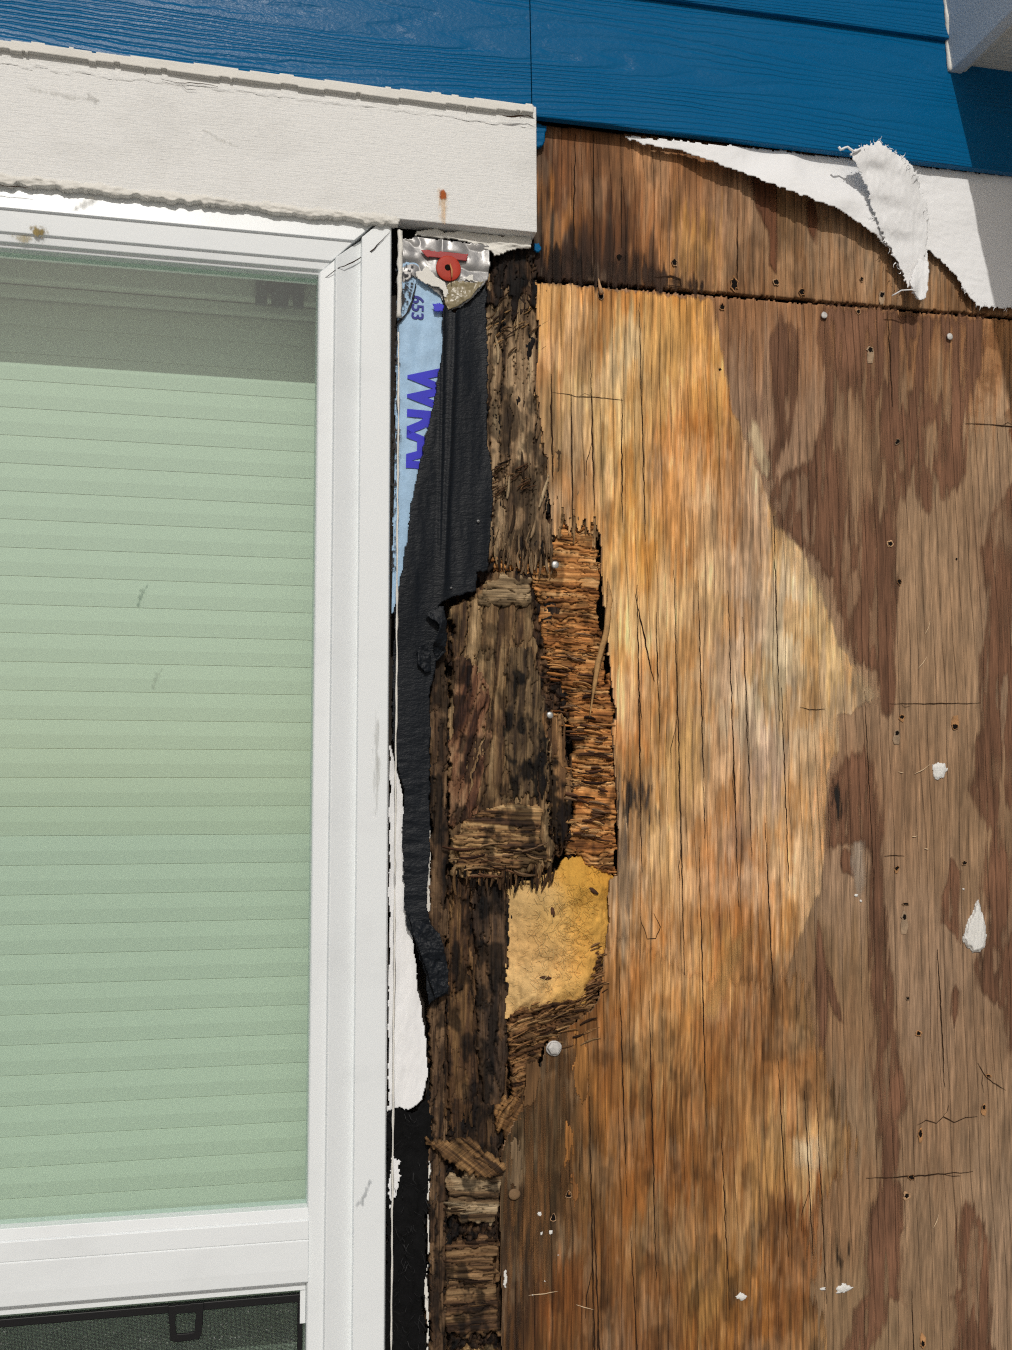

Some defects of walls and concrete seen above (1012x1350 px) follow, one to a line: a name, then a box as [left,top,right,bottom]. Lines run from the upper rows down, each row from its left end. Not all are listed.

peeling [478,573,533,608]
peeling [442,655,555,895]
damp [500,242,982,1350]
damp [970,484,1012,1052]
peeling [494,1086,526,1140]
damp [954,1201,996,1350]